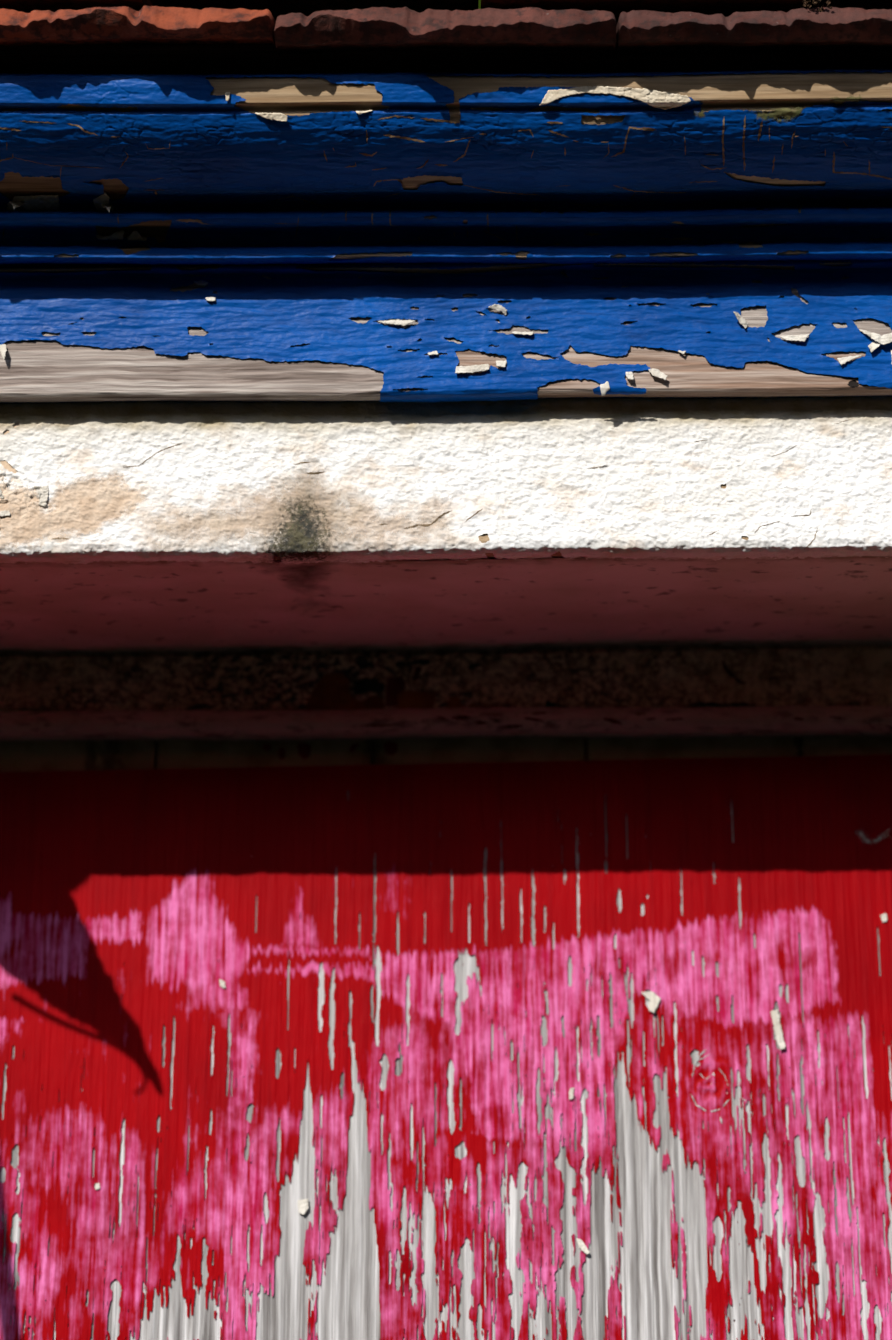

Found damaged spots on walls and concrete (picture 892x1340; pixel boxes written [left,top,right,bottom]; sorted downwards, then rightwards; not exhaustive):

peeling [57,104,138,112]
peeling [206,77,390,122]
peeling [427,72,892,125]
peeling [0,317,433,402]
peeling [349,286,892,398]
flaking render [0,460,143,548]
water stain [155,474,438,582]
spalling [478,533,495,558]
peeling [552,794,608,937]
peeling [1,1045,24,1120]
peeling [85,819,892,1340]
peeling [0,1108,69,1340]